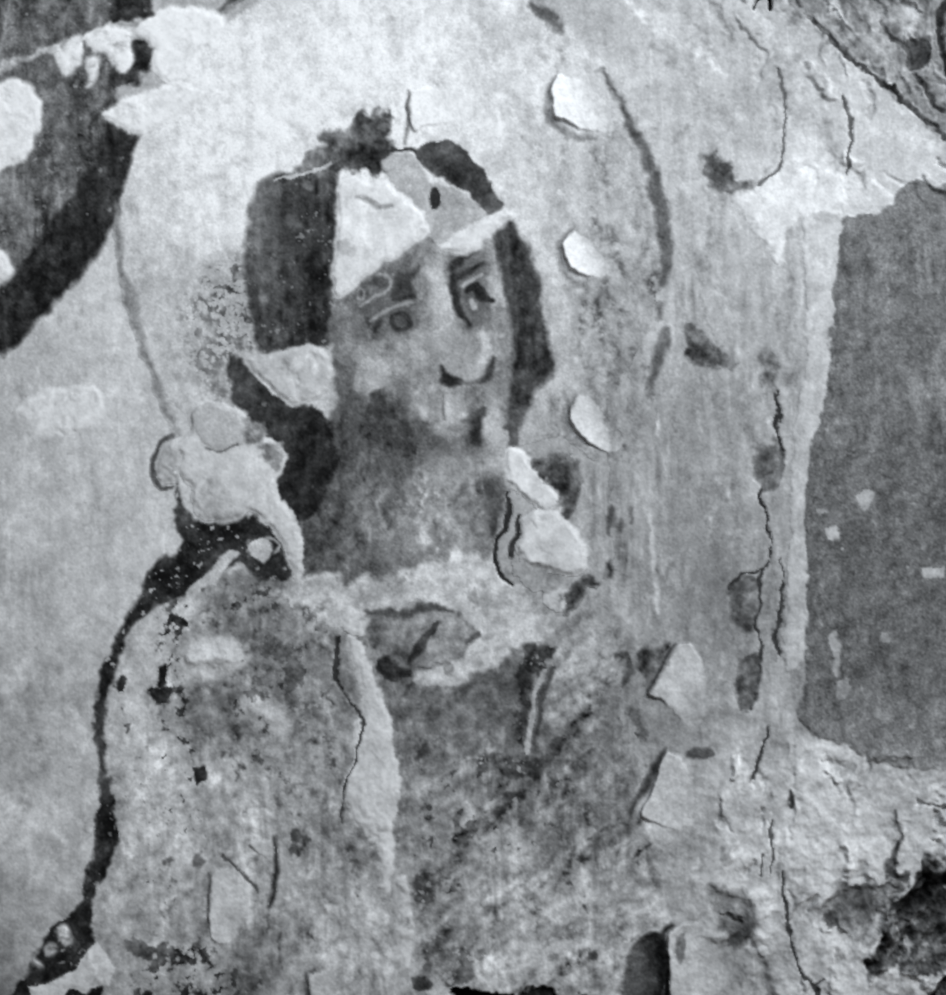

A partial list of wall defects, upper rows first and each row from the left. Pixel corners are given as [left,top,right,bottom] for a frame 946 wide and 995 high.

flaking render [0,76,43,171]
crack [841,95,854,175]
flaking render [0,248,15,285]
crack [772,390,783,448]
flaking render [150,399,305,583]
flaking render [502,446,590,612]
crack [727,488,785,659]
crack [750,726,769,781]
flaking render [821,810,946,995]
flaking render [451,985,556,995]
flaking render [662,907,733,995]